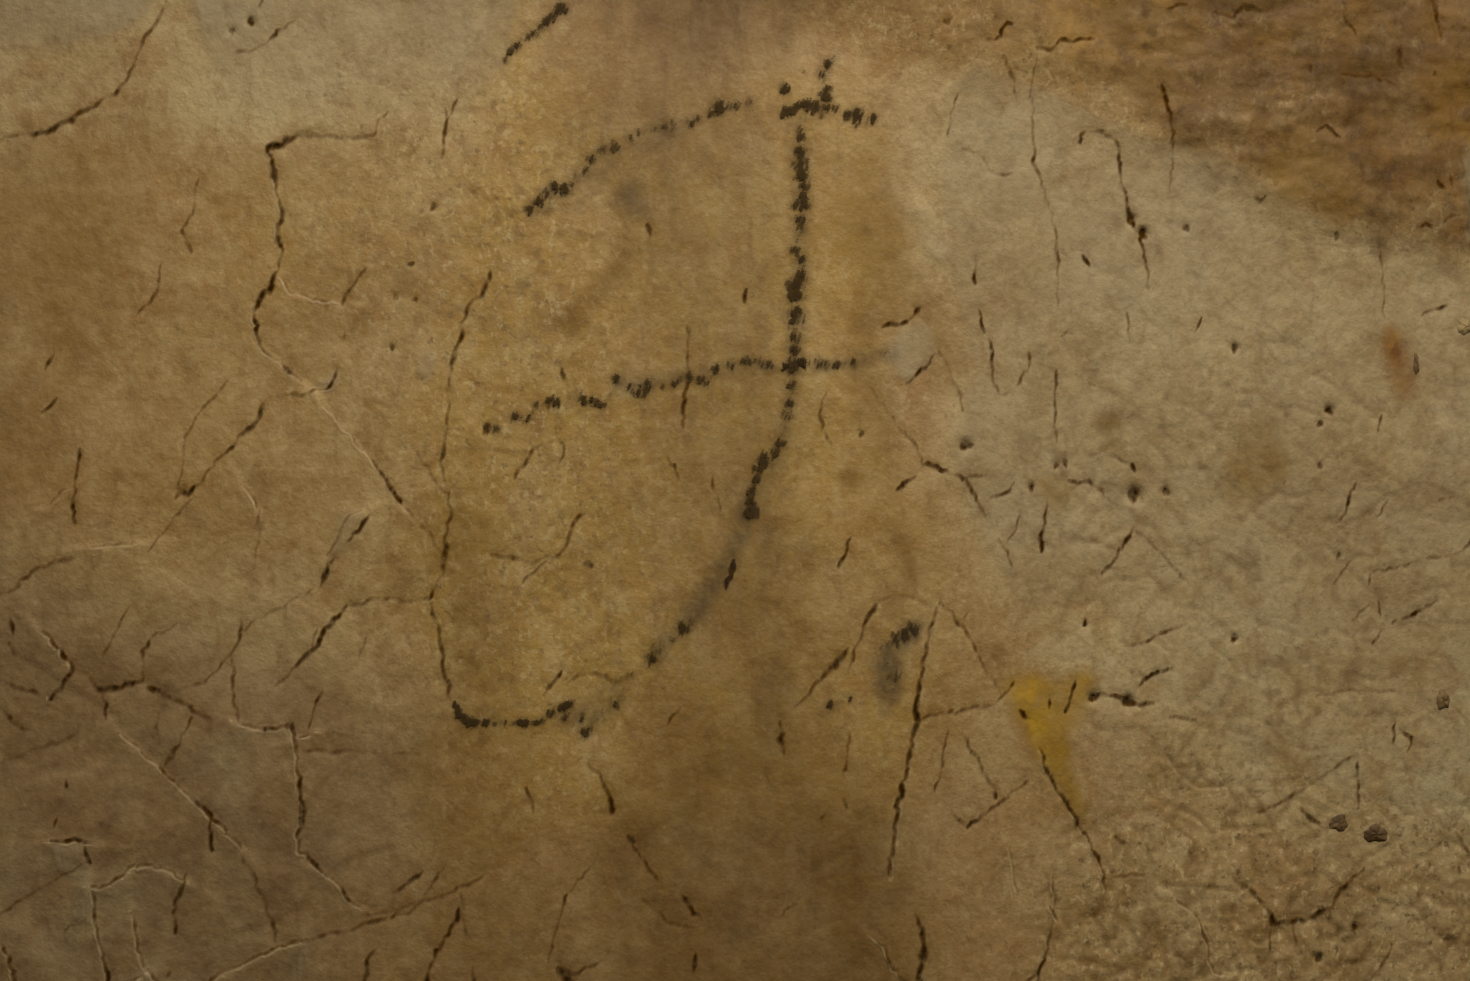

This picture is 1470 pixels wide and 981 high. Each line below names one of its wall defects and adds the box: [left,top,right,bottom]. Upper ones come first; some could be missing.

crack [32,28,153,135]
crack [251,134,362,396]
crack [450,272,492,369]
crack [1079,129,1148,267]
crack [71,448,82,524]
crack [176,407,263,514]
crack [296,460,452,693]
crack [810,606,876,692]
crack [8,617,478,981]
crack [888,620,1194,882]
crack [600,774,699,970]
crack [888,917,928,981]